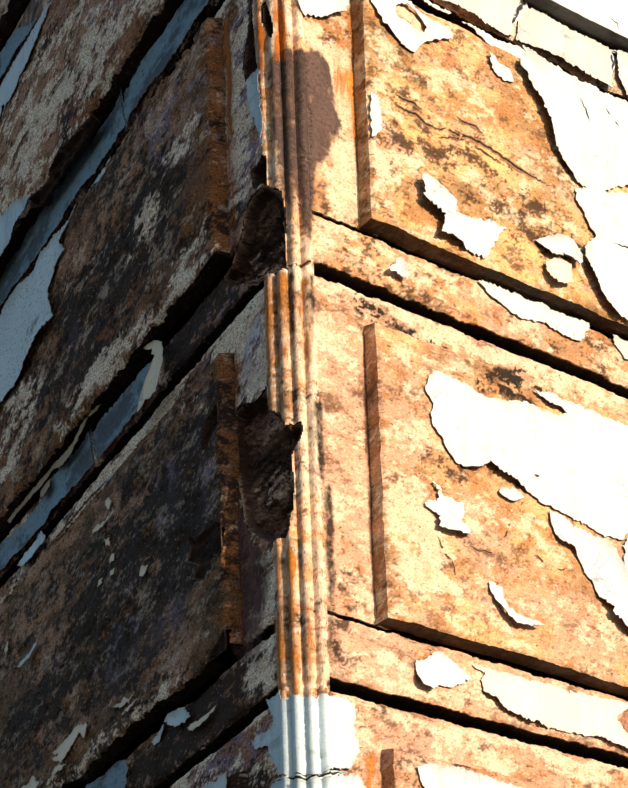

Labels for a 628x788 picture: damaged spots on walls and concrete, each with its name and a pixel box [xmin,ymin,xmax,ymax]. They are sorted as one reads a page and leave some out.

corrosion [257,0,286,82]
peeling [0,0,209,402]
damp [270,48,341,234]
crack [385,89,550,186]
peeling [371,0,628,321]
corrosion [264,272,309,373]
peeling [478,280,590,341]
peeling [425,370,628,627]
corrosion [275,545,300,695]
peeling [252,690,366,788]
crack [274,770,348,781]
peeling [415,651,628,749]